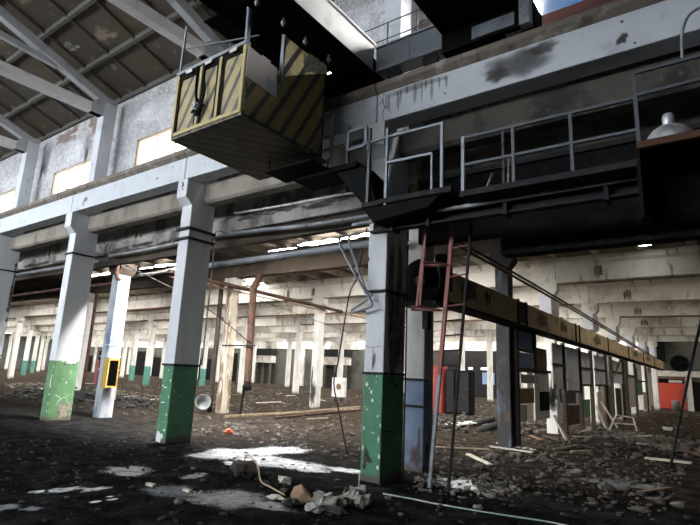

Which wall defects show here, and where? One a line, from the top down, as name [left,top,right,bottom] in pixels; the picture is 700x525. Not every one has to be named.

damp [527,41,555,54]
damp [489,68,506,81]
rust [411,427,430,463]